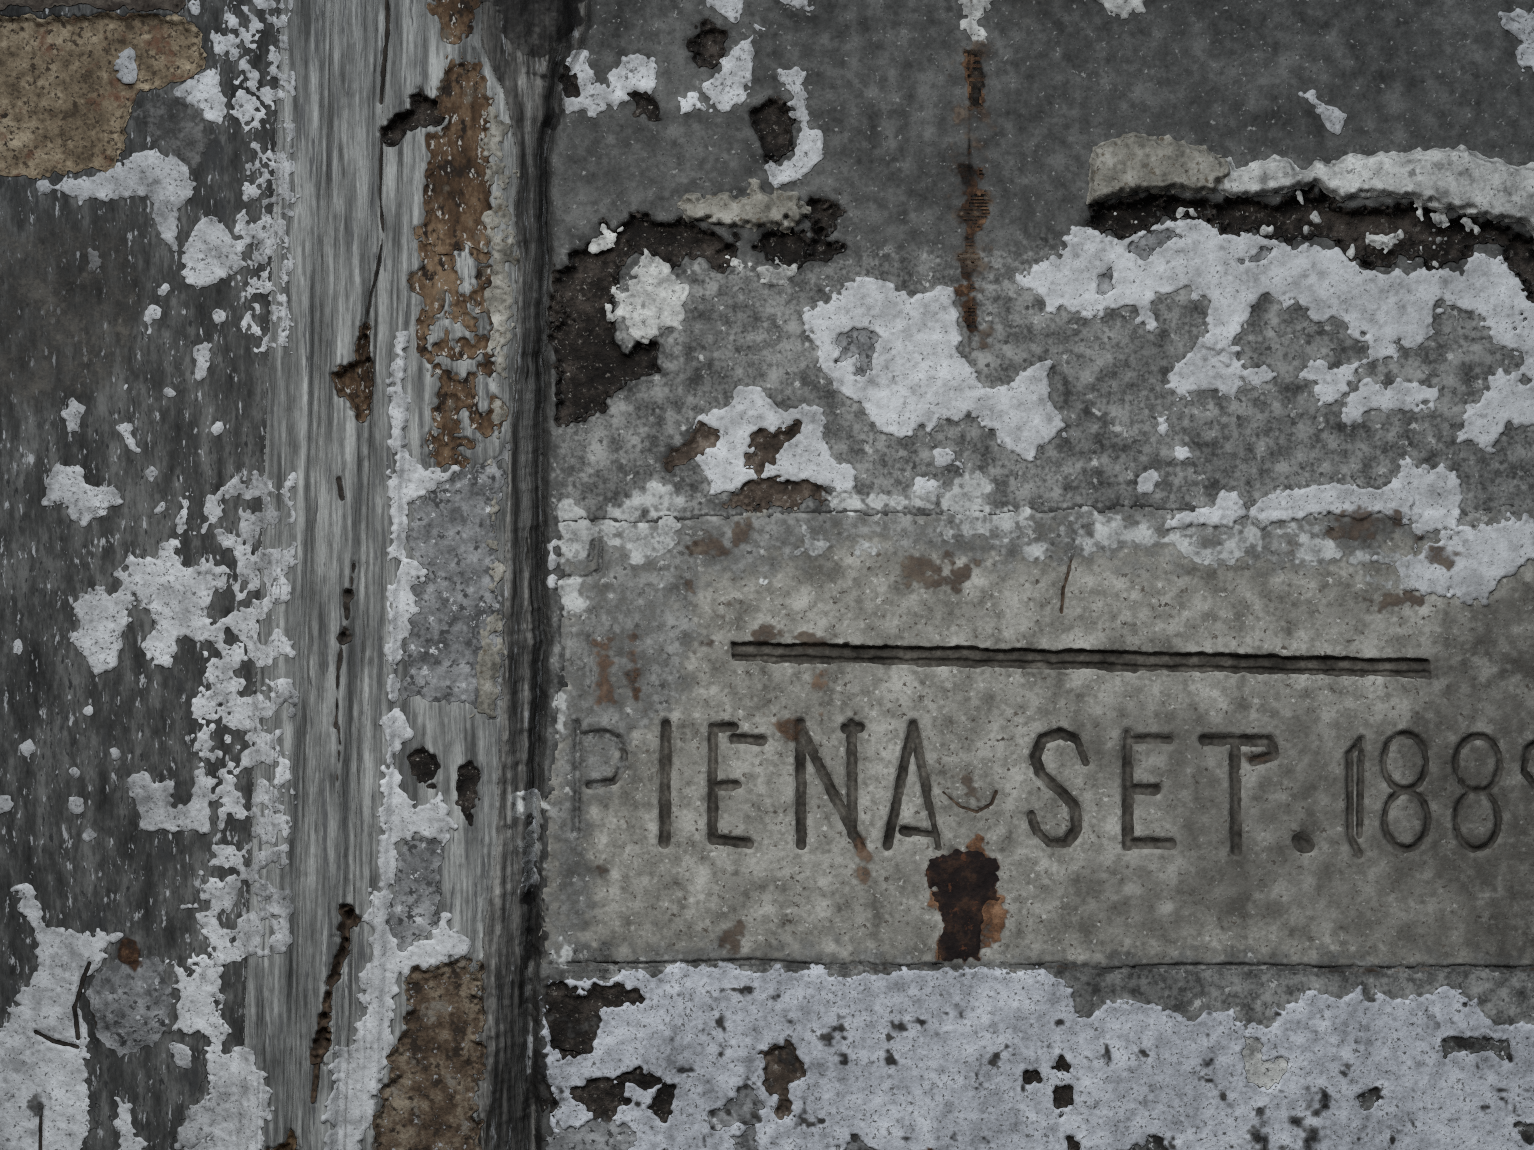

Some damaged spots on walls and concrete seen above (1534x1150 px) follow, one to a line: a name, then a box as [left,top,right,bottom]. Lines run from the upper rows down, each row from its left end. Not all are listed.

flaking render [0,0,300,353]
peeling [558,49,661,121]
peeling [678,0,824,188]
rust [948,40,996,348]
peeling [61,398,86,432]
peeling [116,423,158,482]
peeling [193,342,212,381]
flaking render [547,191,847,427]
peeling [0,464,299,1150]
peeling [510,788,551,893]
rust [926,834,1008,962]
peeling [539,936,1534,1150]